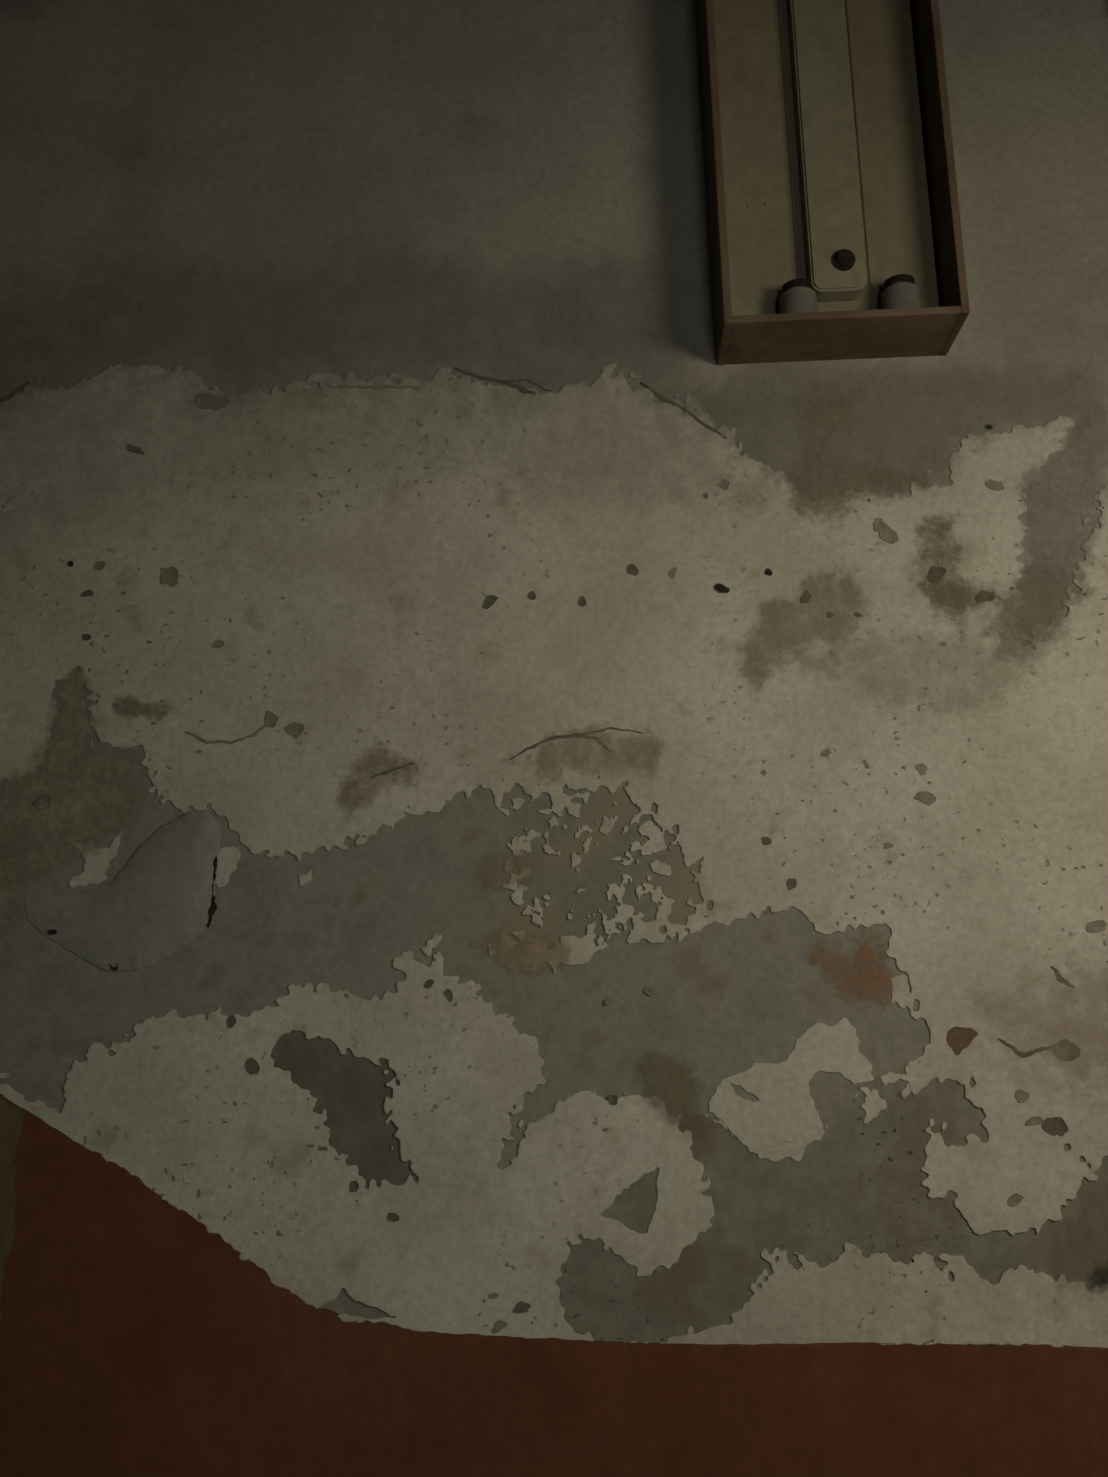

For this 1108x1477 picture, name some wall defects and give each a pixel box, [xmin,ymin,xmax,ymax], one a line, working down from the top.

leakage [919,418,1108,653]
peeling [0,363,1108,1348]
crack [508,727,643,760]